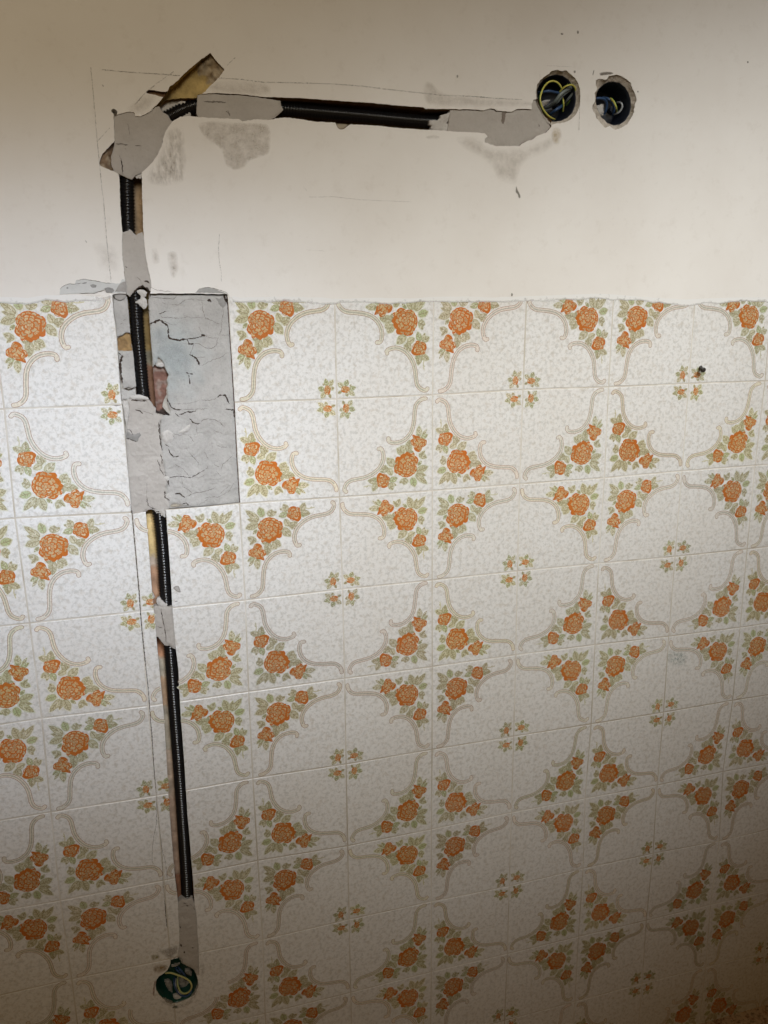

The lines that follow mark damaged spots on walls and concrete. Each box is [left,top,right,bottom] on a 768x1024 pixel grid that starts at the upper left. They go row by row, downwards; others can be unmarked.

flaking render [99,141,115,171]
spalling [117,333,132,351]
spalling [153,365,169,415]
crack [113,277,235,925]